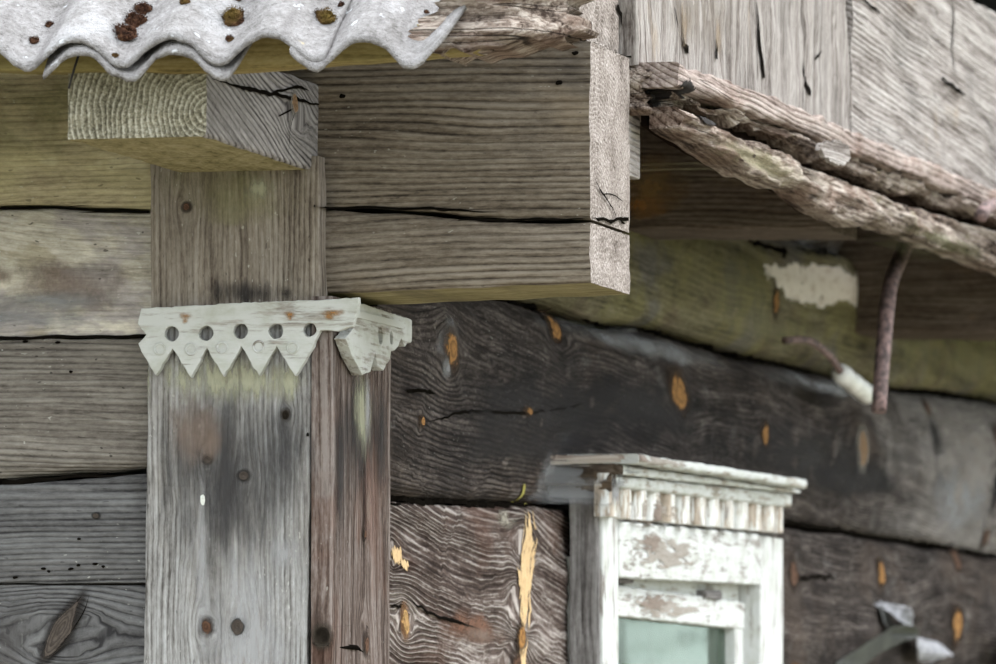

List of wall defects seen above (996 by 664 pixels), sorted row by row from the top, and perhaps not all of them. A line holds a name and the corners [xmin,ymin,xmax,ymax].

crack [0,205,149,213]
crack [314,179,629,224]
crack [407,387,436,395]
crack [425,403,582,422]
leakage [168,419,291,586]
peeling [618,495,696,571]
crack [391,598,478,629]
peeling [633,594,699,618]